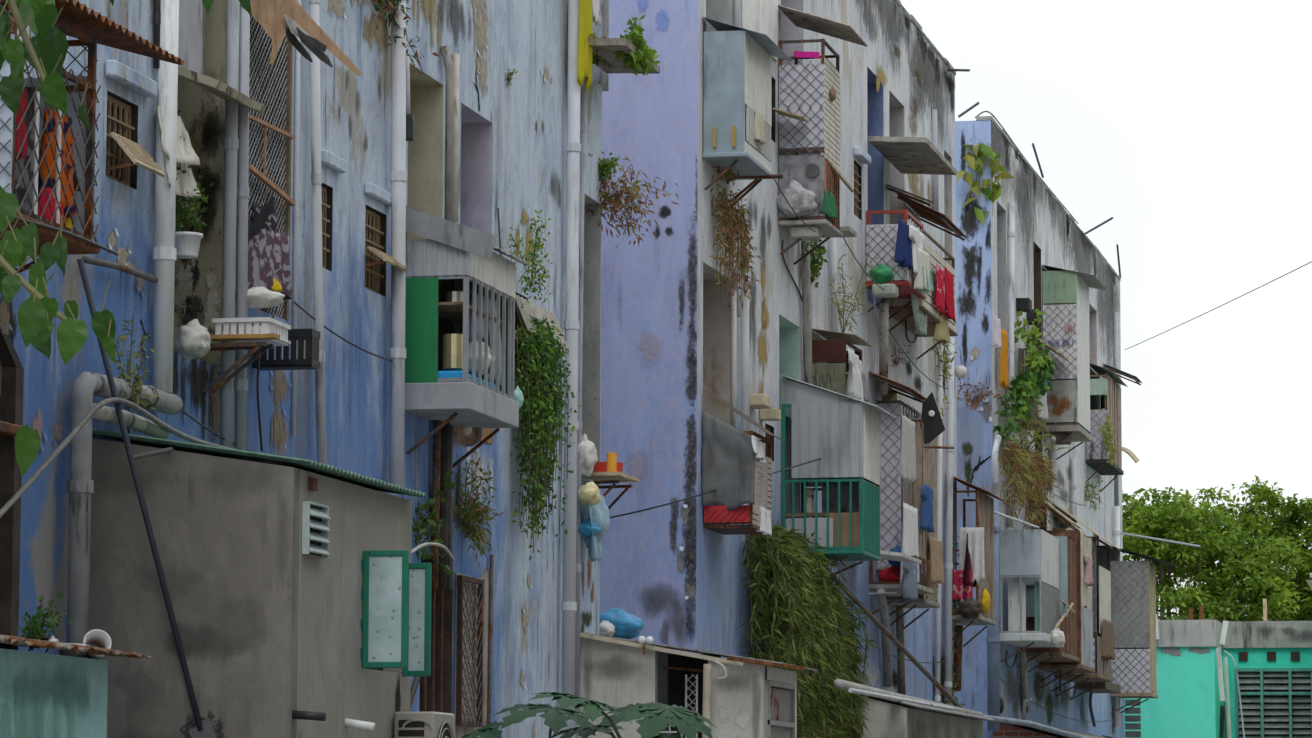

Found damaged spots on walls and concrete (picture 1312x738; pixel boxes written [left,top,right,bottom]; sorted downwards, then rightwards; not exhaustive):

peeling [327,0,369,19]
peeling [470,0,489,98]
water stain [959,192,991,365]
water stain [991,120,1120,364]
water stain [646,159,697,643]
spalling [180,710,227,738]